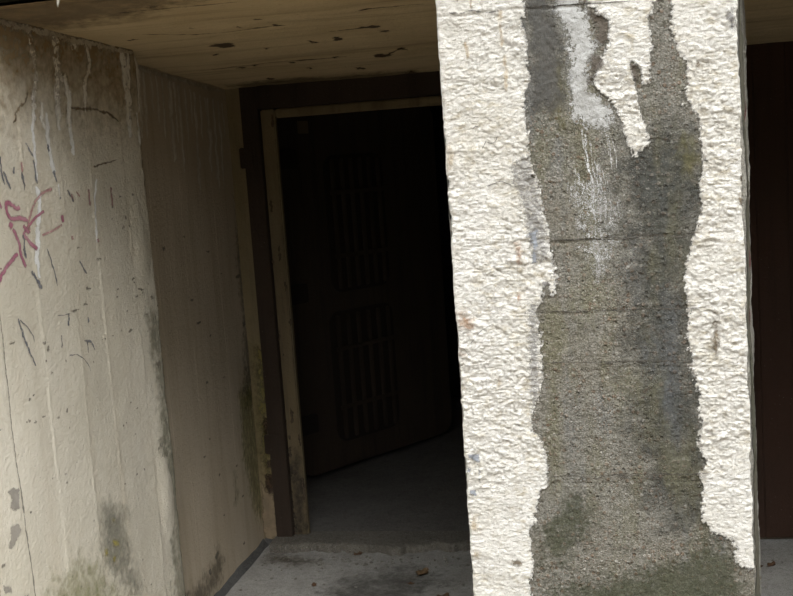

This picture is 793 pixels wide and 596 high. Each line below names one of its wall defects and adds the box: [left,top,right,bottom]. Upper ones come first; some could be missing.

crack [526,1,626,9]
crack [71,107,118,121]
leakage [0,0,225,278]
peeling [520,0,755,596]
leakage [105,511,138,588]